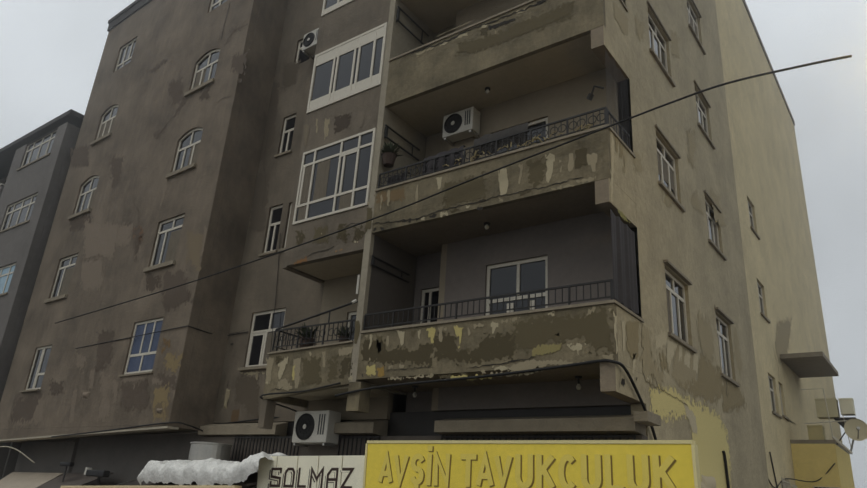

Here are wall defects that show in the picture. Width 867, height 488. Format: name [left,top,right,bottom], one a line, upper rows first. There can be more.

peeling [450,308,618,381]
peeling [348,365,376,381]
spalling [388,364,434,380]